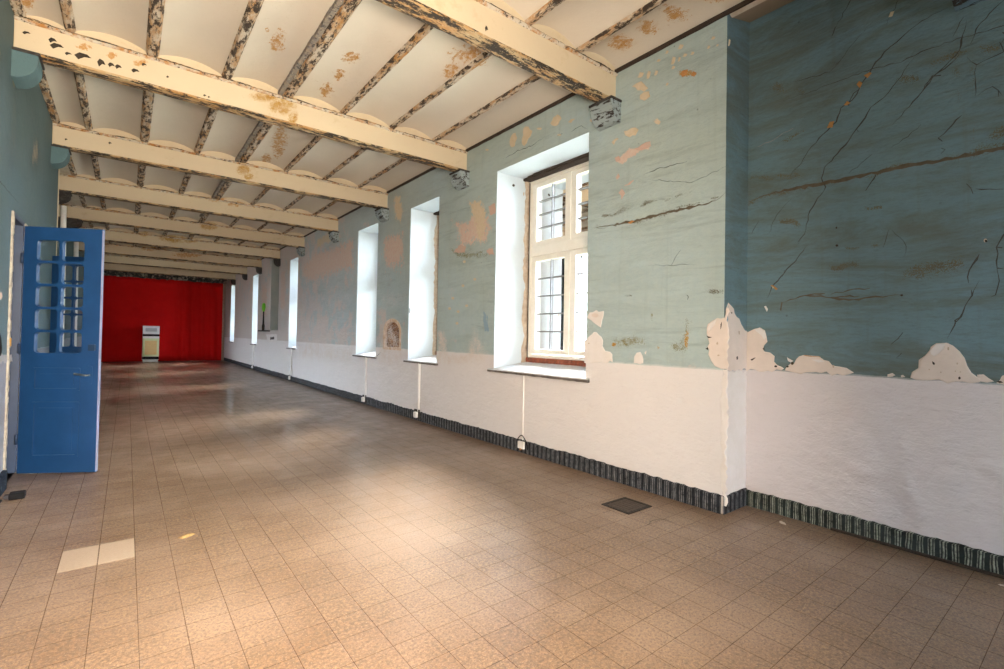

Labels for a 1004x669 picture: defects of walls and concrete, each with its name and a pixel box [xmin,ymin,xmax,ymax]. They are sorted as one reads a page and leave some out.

peeling [48,38,146,72]
crack [648,161,740,183]
crack [752,0,1004,311]
crack [949,234,1004,335]
peeling [584,310,613,363]
peeling [706,303,854,376]
peeling [887,343,1004,385]